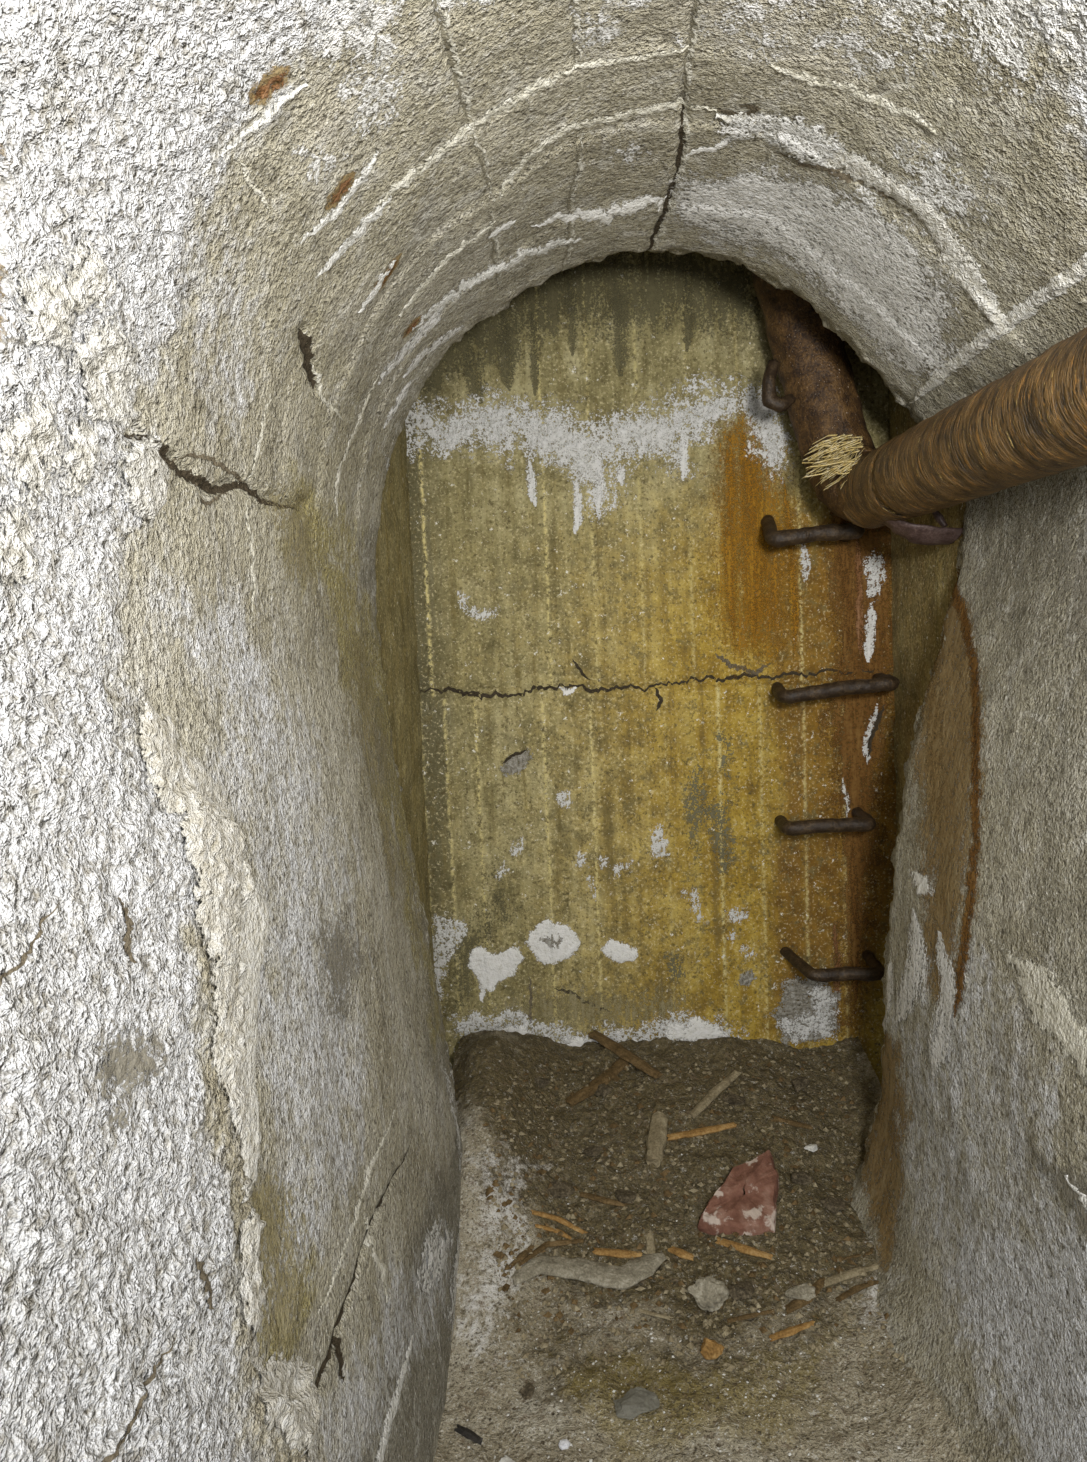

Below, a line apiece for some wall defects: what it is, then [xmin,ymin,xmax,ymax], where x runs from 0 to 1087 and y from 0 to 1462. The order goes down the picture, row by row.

crack [648,0,705,251]
peeling [0,231,169,585]
crack [124,433,299,511]
leakage [377,104,1087,534]
corrosion [701,411,808,678]
crack [420,653,893,711]
corrosion [817,504,895,1036]
corrosion [906,566,988,1018]
crack [315,1145,410,1389]
corrosion [860,1032,914,1273]